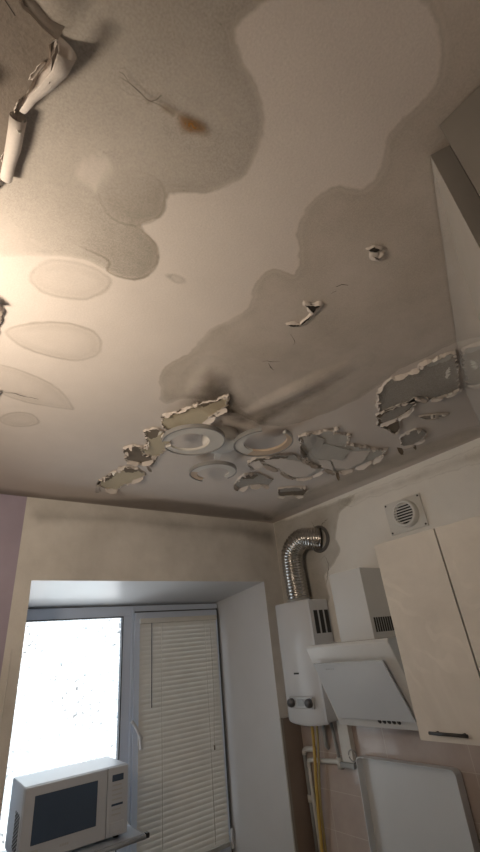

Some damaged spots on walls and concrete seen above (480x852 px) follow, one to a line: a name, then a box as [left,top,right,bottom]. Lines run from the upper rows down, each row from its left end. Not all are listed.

peeling [95,393,230,494]
peeling [233,350,463,499]